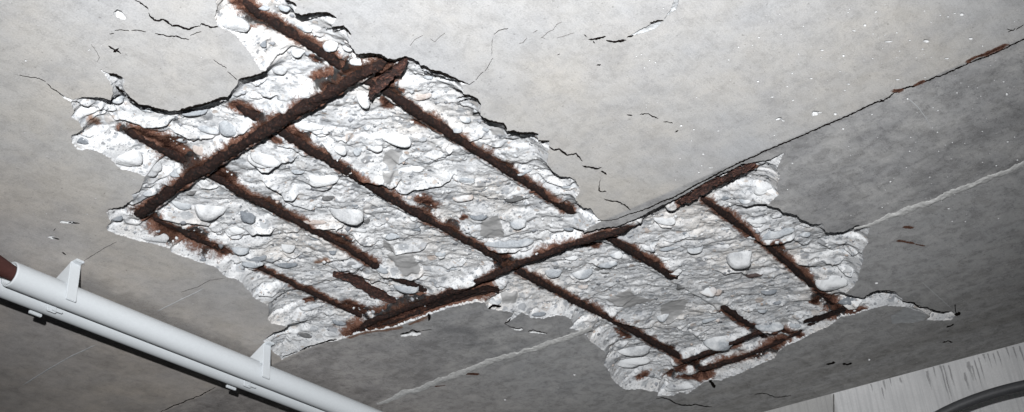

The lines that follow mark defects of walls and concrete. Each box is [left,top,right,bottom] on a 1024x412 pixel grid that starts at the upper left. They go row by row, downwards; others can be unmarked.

crack [92,0,266,112]
spalling [61,0,604,360]
corrosion [115,0,868,382]
crack [286,0,1024,221]
spalling [632,0,679,35]
spalling [363,153,955,396]
corrosion [966,44,1008,63]